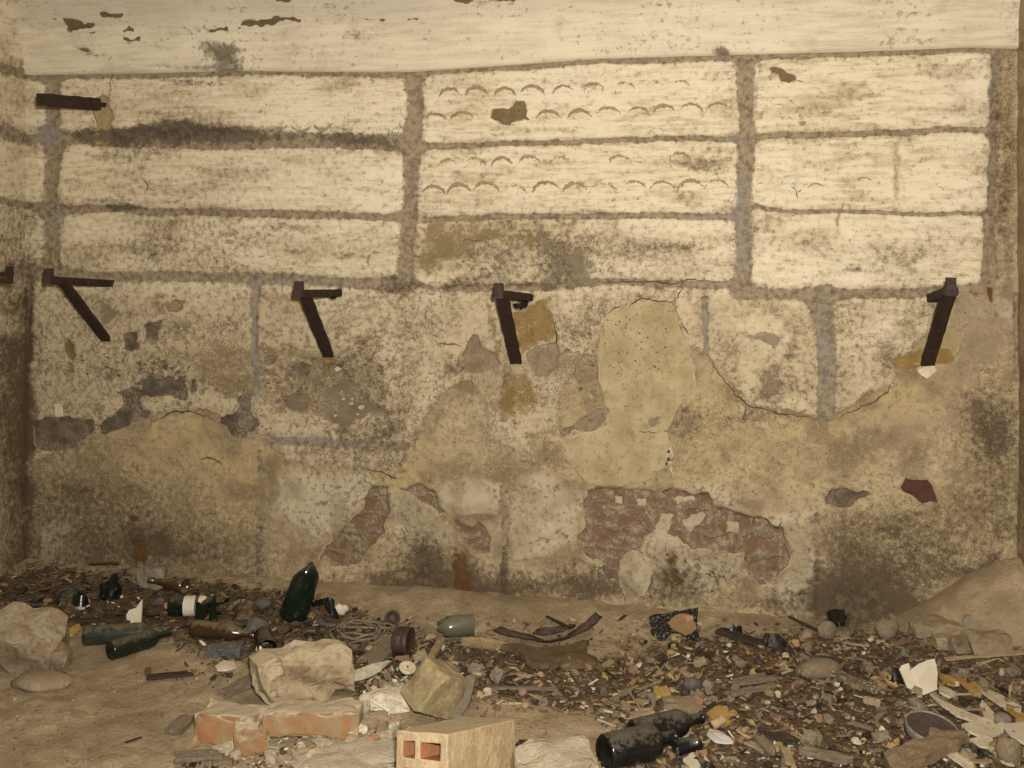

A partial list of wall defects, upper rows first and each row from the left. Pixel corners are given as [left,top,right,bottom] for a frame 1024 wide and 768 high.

peeling [53,11,141,42]
peeling [209,15,301,33]
leakage [73,123,298,146]
leakage [320,131,395,149]
flaking render [490,101,530,126]
crack [595,279,714,333]
flaking render [32,299,197,452]
crack [706,354,891,421]
flaking render [526,299,792,586]
leakage [965,396,1015,459]
peeling [900,477,938,505]
flaking render [319,483,491,568]